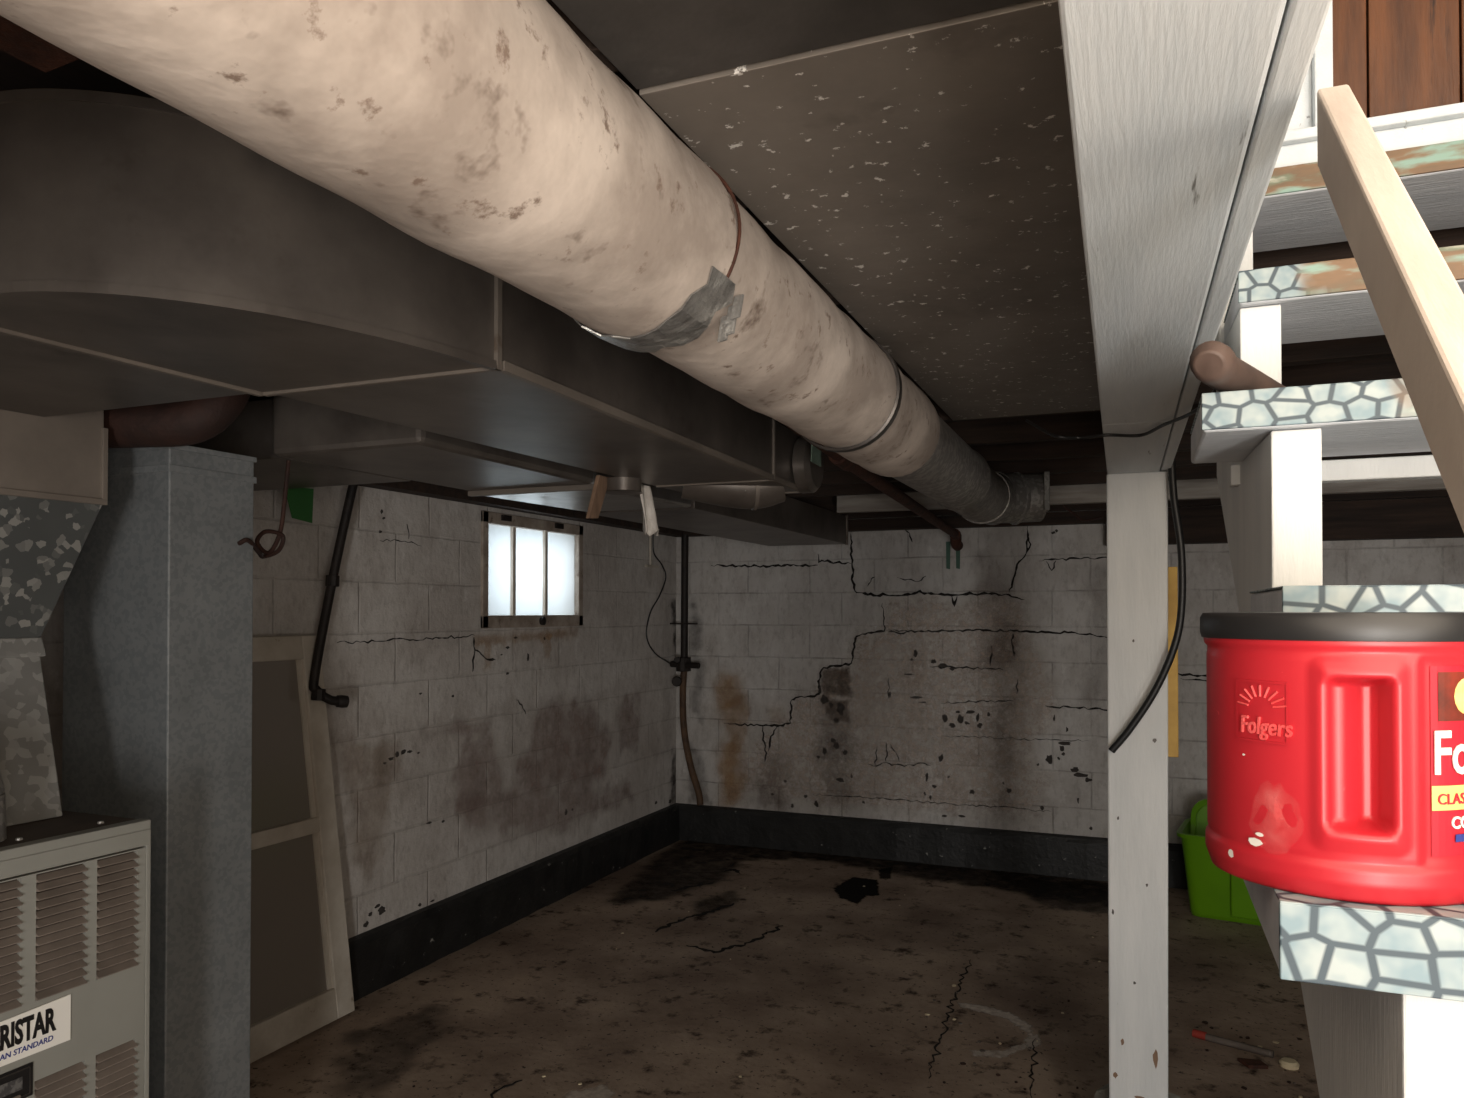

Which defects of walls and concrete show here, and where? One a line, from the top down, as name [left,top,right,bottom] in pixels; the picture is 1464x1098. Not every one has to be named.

crack [711,526,1107,812]
spalling [817,685,847,759]
spalling [942,710,990,728]
crack [655,869,783,953]
damp [611,841,1108,912]
crack [928,959,972,1078]
crack [490,1080,522,1098]
crack [1028,1038,1039,1098]